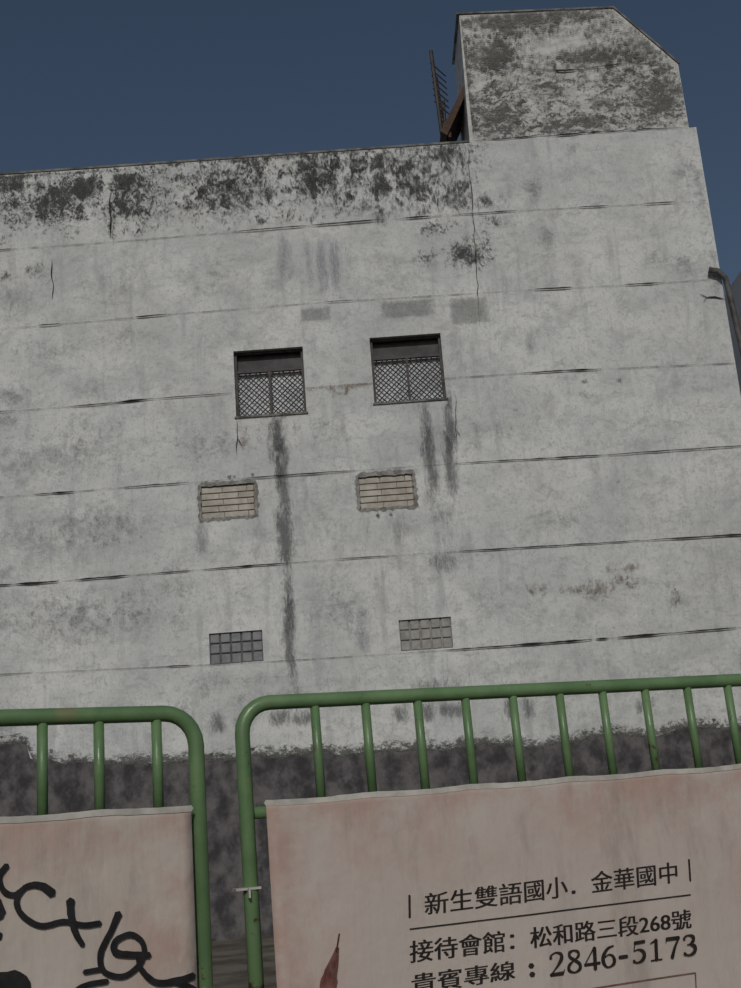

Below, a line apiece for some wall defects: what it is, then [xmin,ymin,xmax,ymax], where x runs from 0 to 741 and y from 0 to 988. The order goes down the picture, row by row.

damp [0,7,688,239]
crack [78,188,179,245]
crack [241,219,382,231]
damp [451,238,489,267]
damp [272,420,290,503]
damp [423,398,456,487]
damp [277,514,292,561]
damp [284,583,294,670]